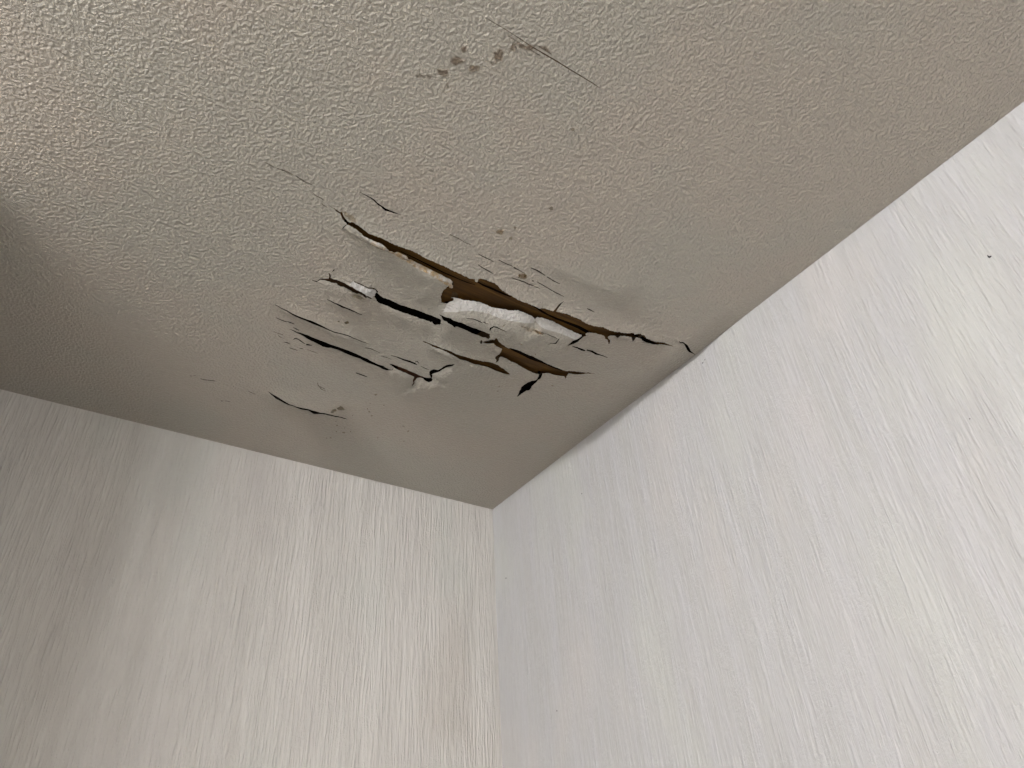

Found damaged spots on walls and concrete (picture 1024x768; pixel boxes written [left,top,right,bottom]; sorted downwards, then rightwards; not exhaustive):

crack [265,162,326,207]
crack [360,192,400,215]
crack [450,234,564,297]
crack [274,269,509,386]
crack [541,318,608,358]
crack [193,375,346,419]